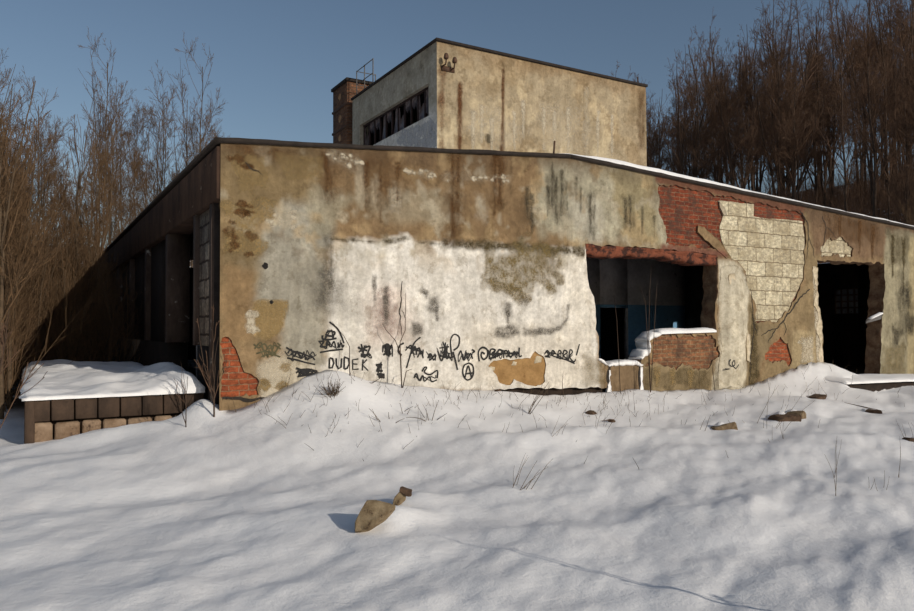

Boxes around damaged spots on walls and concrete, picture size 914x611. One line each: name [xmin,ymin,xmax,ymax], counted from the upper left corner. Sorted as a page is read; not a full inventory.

flaking render [658,185,805,249]
spalling [821,237,852,257]
spalling [220,337,293,398]
peeling [489,352,545,386]
spalling [765,338,791,366]
crack [749,289,810,381]
flaking render [812,266,824,362]
damp [891,235,914,344]